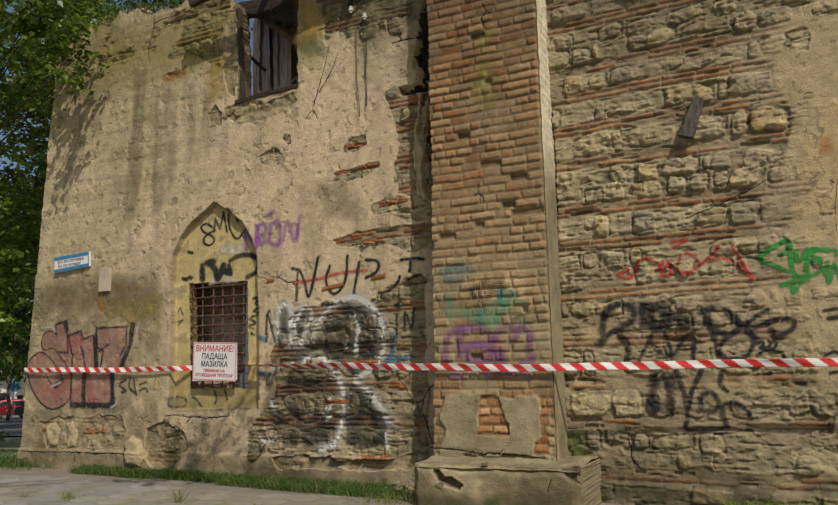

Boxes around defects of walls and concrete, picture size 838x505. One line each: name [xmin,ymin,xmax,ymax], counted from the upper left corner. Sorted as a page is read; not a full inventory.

flaking render [208,7,296,127]
crack [374,1,430,99]
flaking render [259,147,282,164]
flaking render [334,87,434,252]
crack [425,121,433,162]
flaking render [263,300,419,471]
flaking render [39,415,126,451]
flaking render [147,420,188,468]
crack [419,384,553,490]
flaking render [476,395,509,436]
spalling [435,470,462,489]